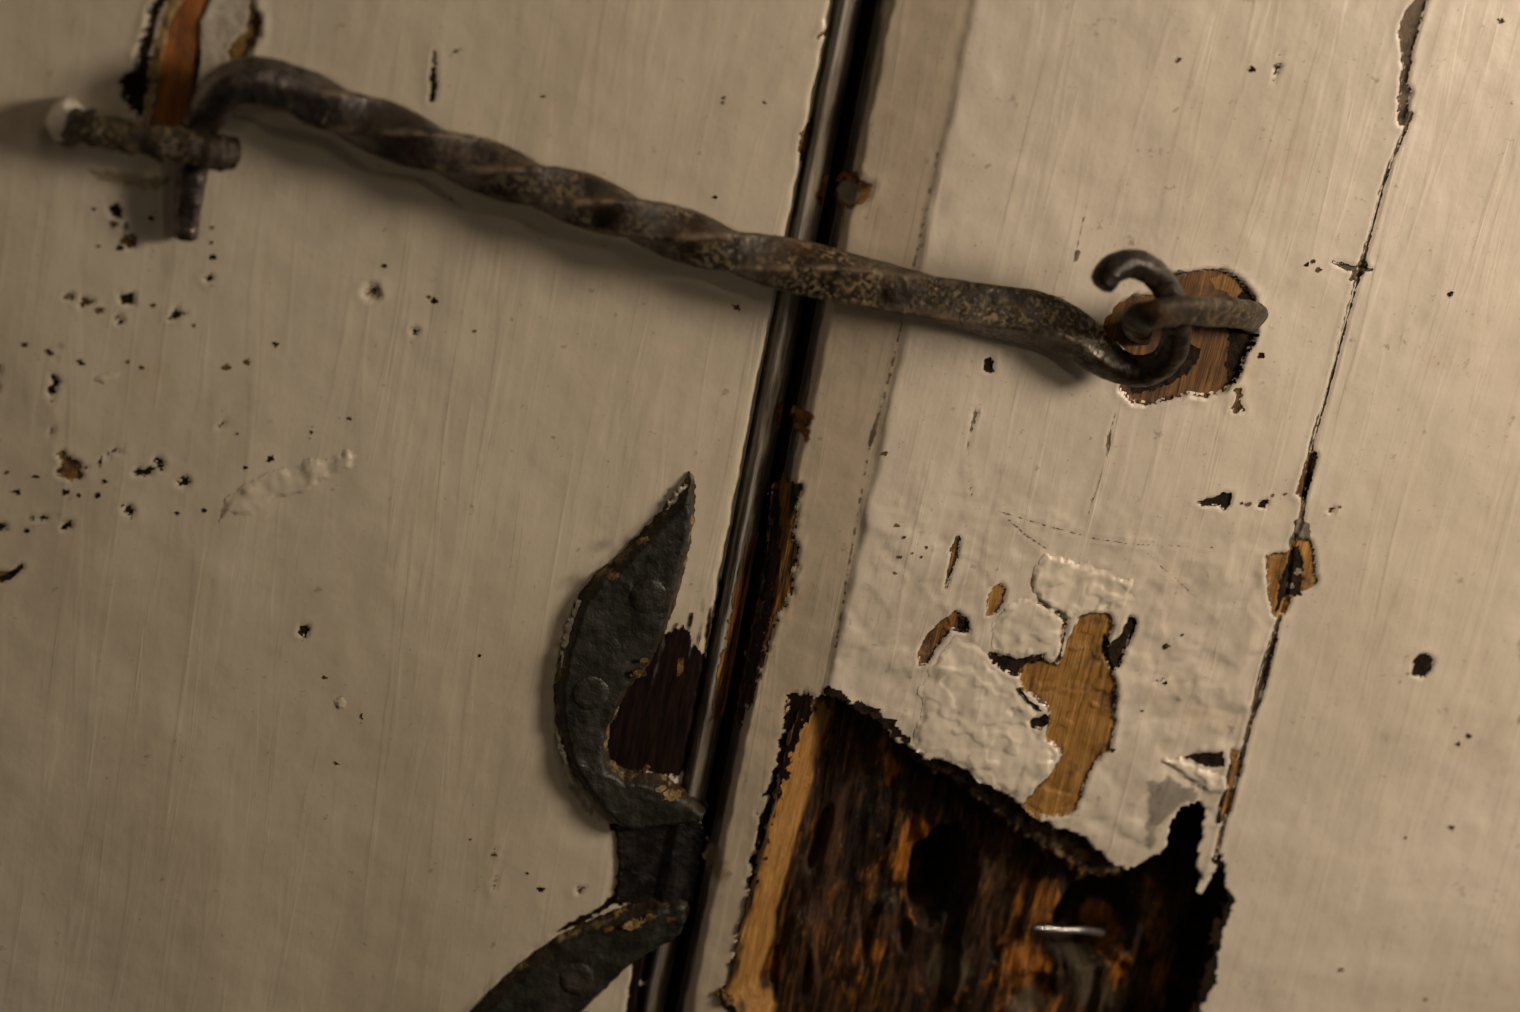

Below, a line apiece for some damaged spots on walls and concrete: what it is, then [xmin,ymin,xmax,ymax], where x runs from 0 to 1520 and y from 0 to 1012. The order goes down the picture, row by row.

peeling [119,0,262,126]
peeling [1173,269,1257,302]
crack [1308,111,1414,456]
peeling [1119,325,1265,414]
peeling [709,473,803,731]
peeling [918,610,970,666]
peeling [1198,451,1318,510]
peeling [1266,519,1318,617]
crack [1290,496,1307,545]
peeling [988,601,1137,819]
crack [1214,615,1282,856]
peeling [1185,748,1243,823]